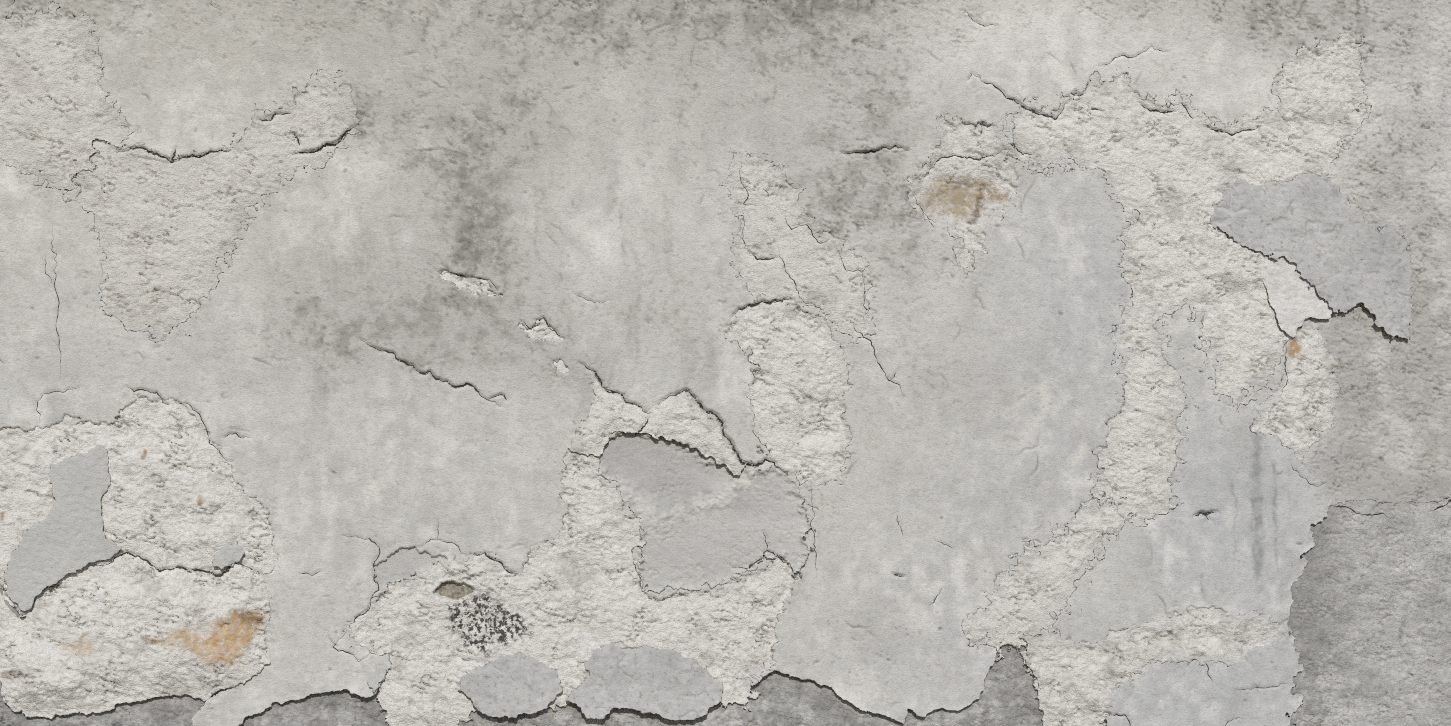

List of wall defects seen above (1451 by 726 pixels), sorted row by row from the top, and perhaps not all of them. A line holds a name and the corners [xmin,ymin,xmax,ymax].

crack [968,74,1102,120]
crack [1142,103,1259,136]
spalling [0,1,363,343]
crack [844,143,1032,223]
corrosion [929,180,999,215]
crack [360,339,507,404]
spalling [747,31,1414,726]
spalling [191,148,877,726]
spalling [0,394,279,616]
corrosion [176,613,261,661]